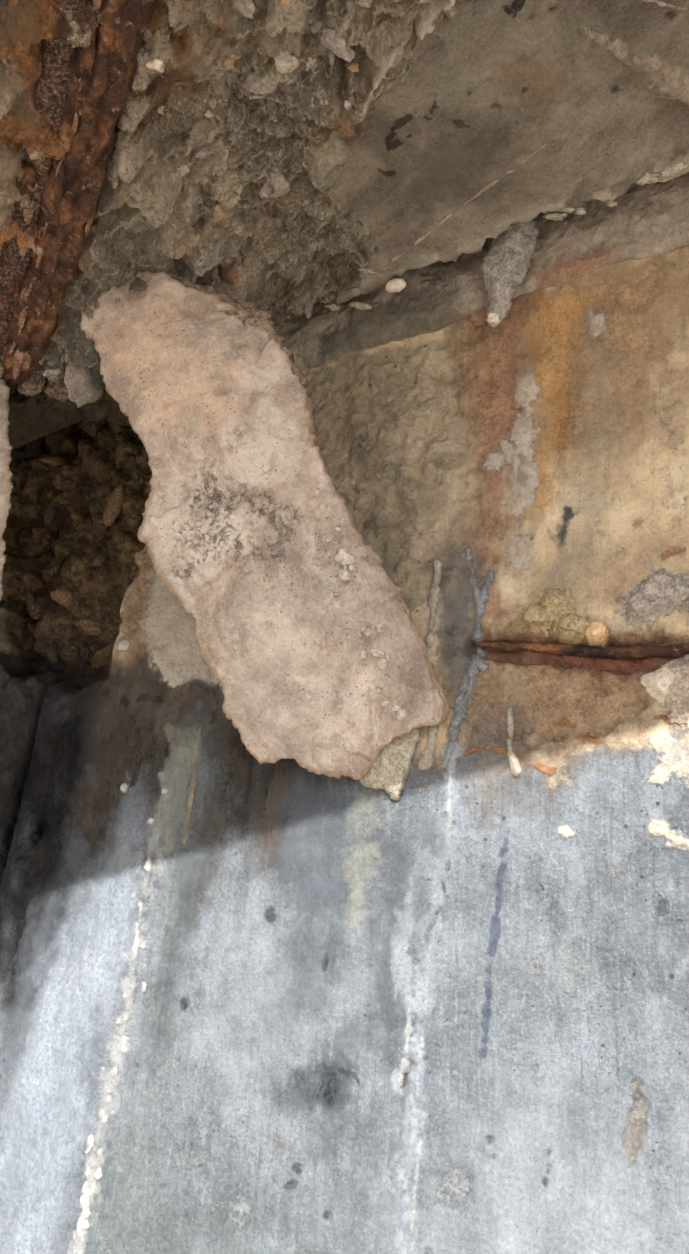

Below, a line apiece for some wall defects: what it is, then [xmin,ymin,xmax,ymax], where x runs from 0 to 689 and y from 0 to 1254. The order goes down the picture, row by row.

corrosion [0,0,200,385]
spalling [111,0,443,260]
crack [378,102,469,177]
crack [386,148,540,266]
spalling [38,338,103,408]
water stain [436,554,658,811]
corrosion [473,634,689,694]
spalling [641,639,689,786]
water stain [0,543,352,1254]
peeling [557,825,575,838]
peeling [648,818,689,850]
water stain [380,902,434,1125]